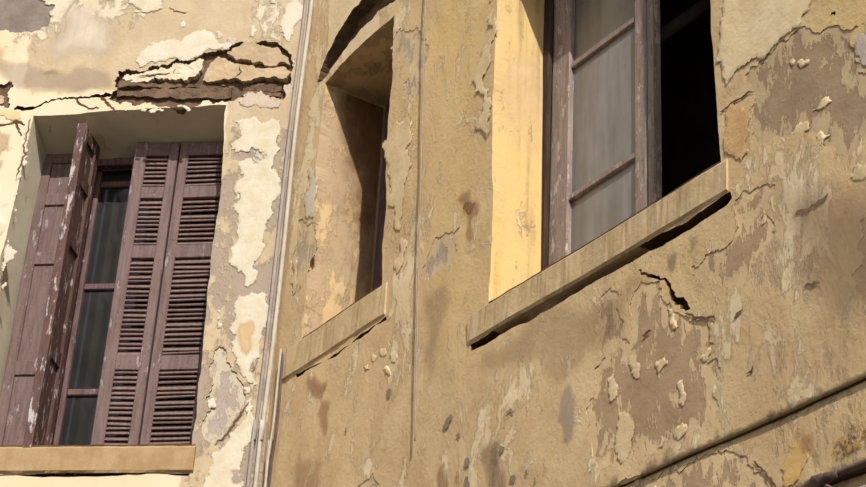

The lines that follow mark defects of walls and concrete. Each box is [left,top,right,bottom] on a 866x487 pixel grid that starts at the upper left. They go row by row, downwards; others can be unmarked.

flaking render [0,81,32,180]
crack [0,92,121,176]
peeling [136,21,237,68]
peeling [255,0,307,43]
flaking render [391,26,430,106]
flaking render [716,0,866,181]
peeling [382,118,413,273]
peeling [201,91,282,487]
crack [638,192,743,321]
crack [471,331,501,351]
flaking render [586,280,721,471]
flaking render [619,435,811,487]